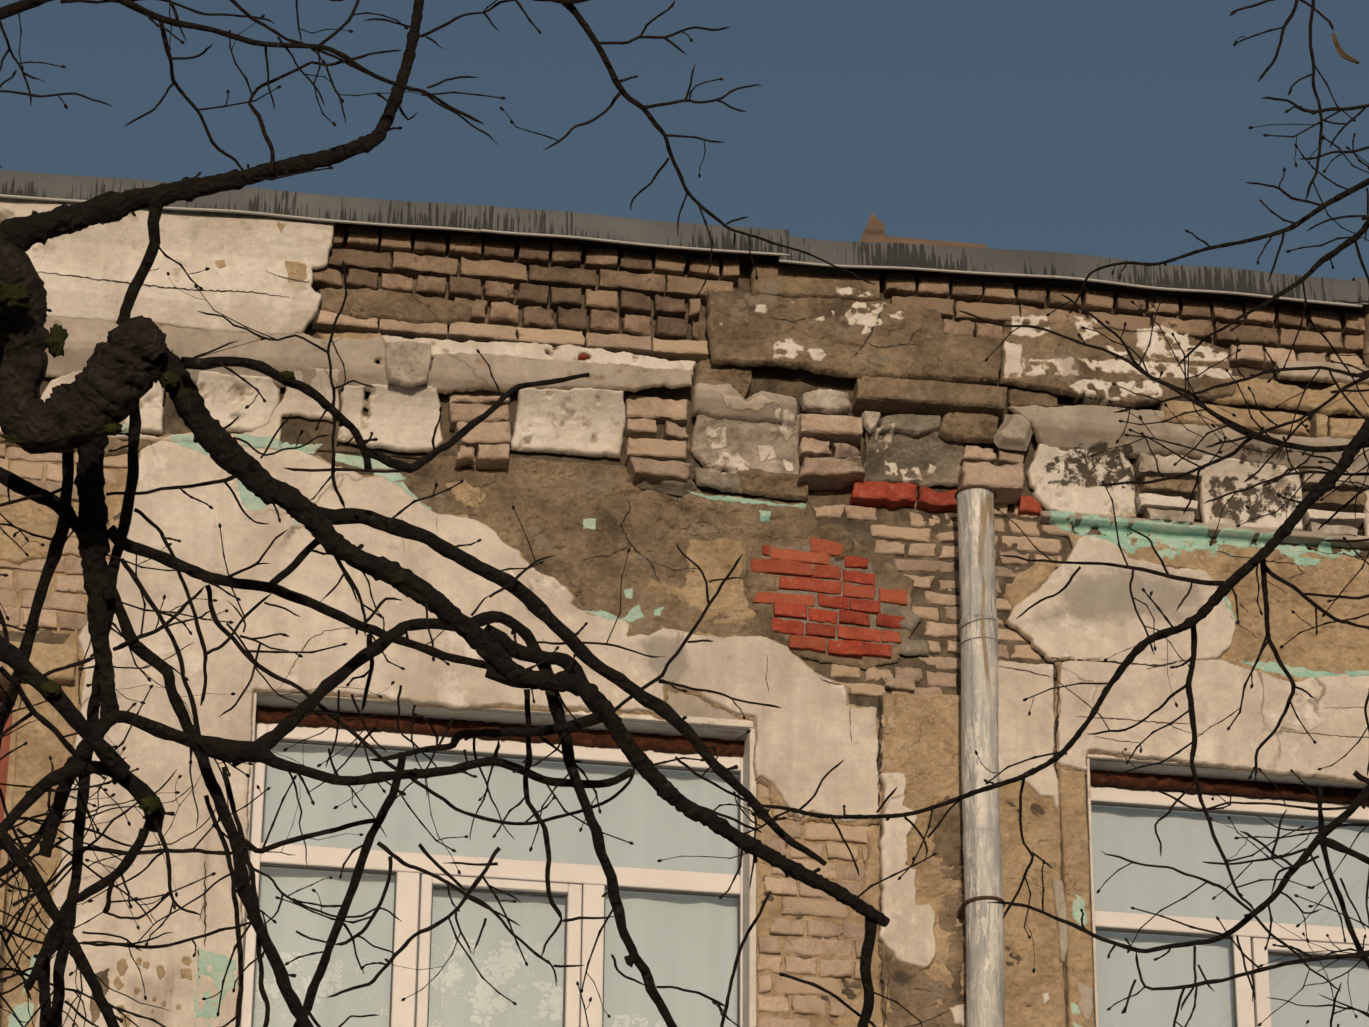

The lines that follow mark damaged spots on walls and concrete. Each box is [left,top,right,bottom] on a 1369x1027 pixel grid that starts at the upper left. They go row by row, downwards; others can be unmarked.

peeling [754,304,768,315]
peeling [815,287,905,335]
flaking render [103,423,154,564]
peeling [170,434,210,455]
flaking render [0,434,88,1027]
spalling [233,314,1369,1027]